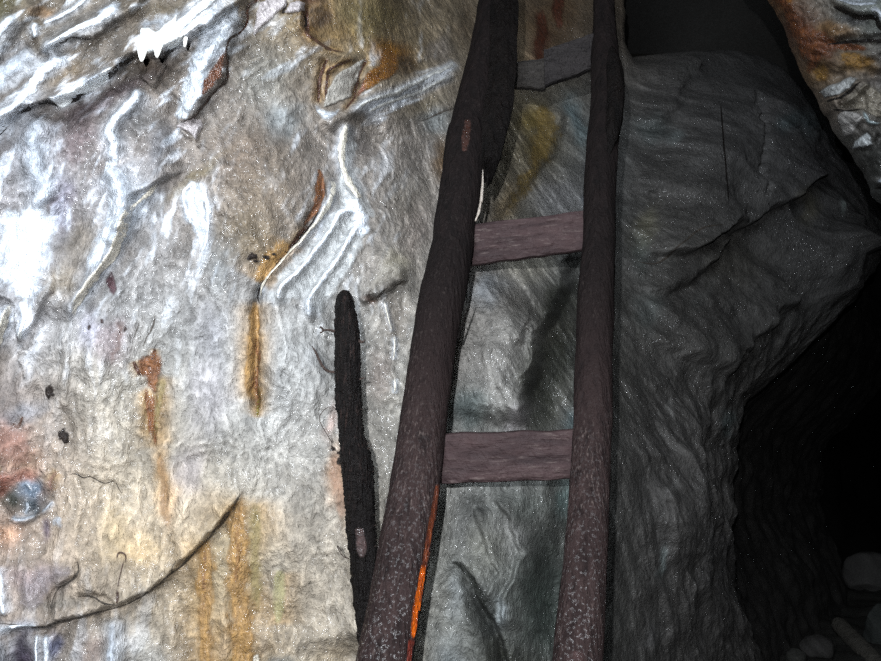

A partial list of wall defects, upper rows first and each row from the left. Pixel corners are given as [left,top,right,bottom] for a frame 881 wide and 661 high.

rust [133,349,164,443]
rust [245,303,260,416]